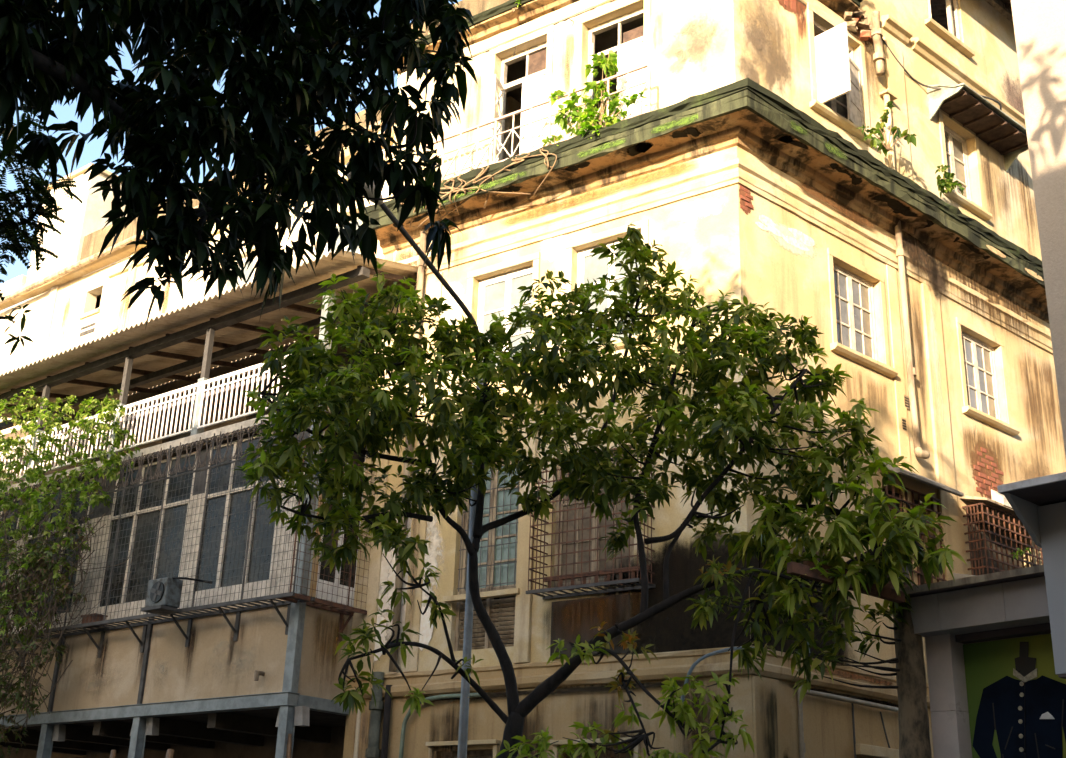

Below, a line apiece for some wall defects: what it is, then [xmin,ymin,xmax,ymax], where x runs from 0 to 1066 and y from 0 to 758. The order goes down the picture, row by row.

flaking render [778,0,807,17]
water stain [741,0,788,91]
water stain [627,142,652,156]
water stain [672,127,703,138]
water stain [773,134,808,150]
water stain [496,185,522,195]
water stain [504,162,692,224]
peeling [739,185,816,259]
water stain [799,182,875,228]
flaking render [970,441,1004,499]